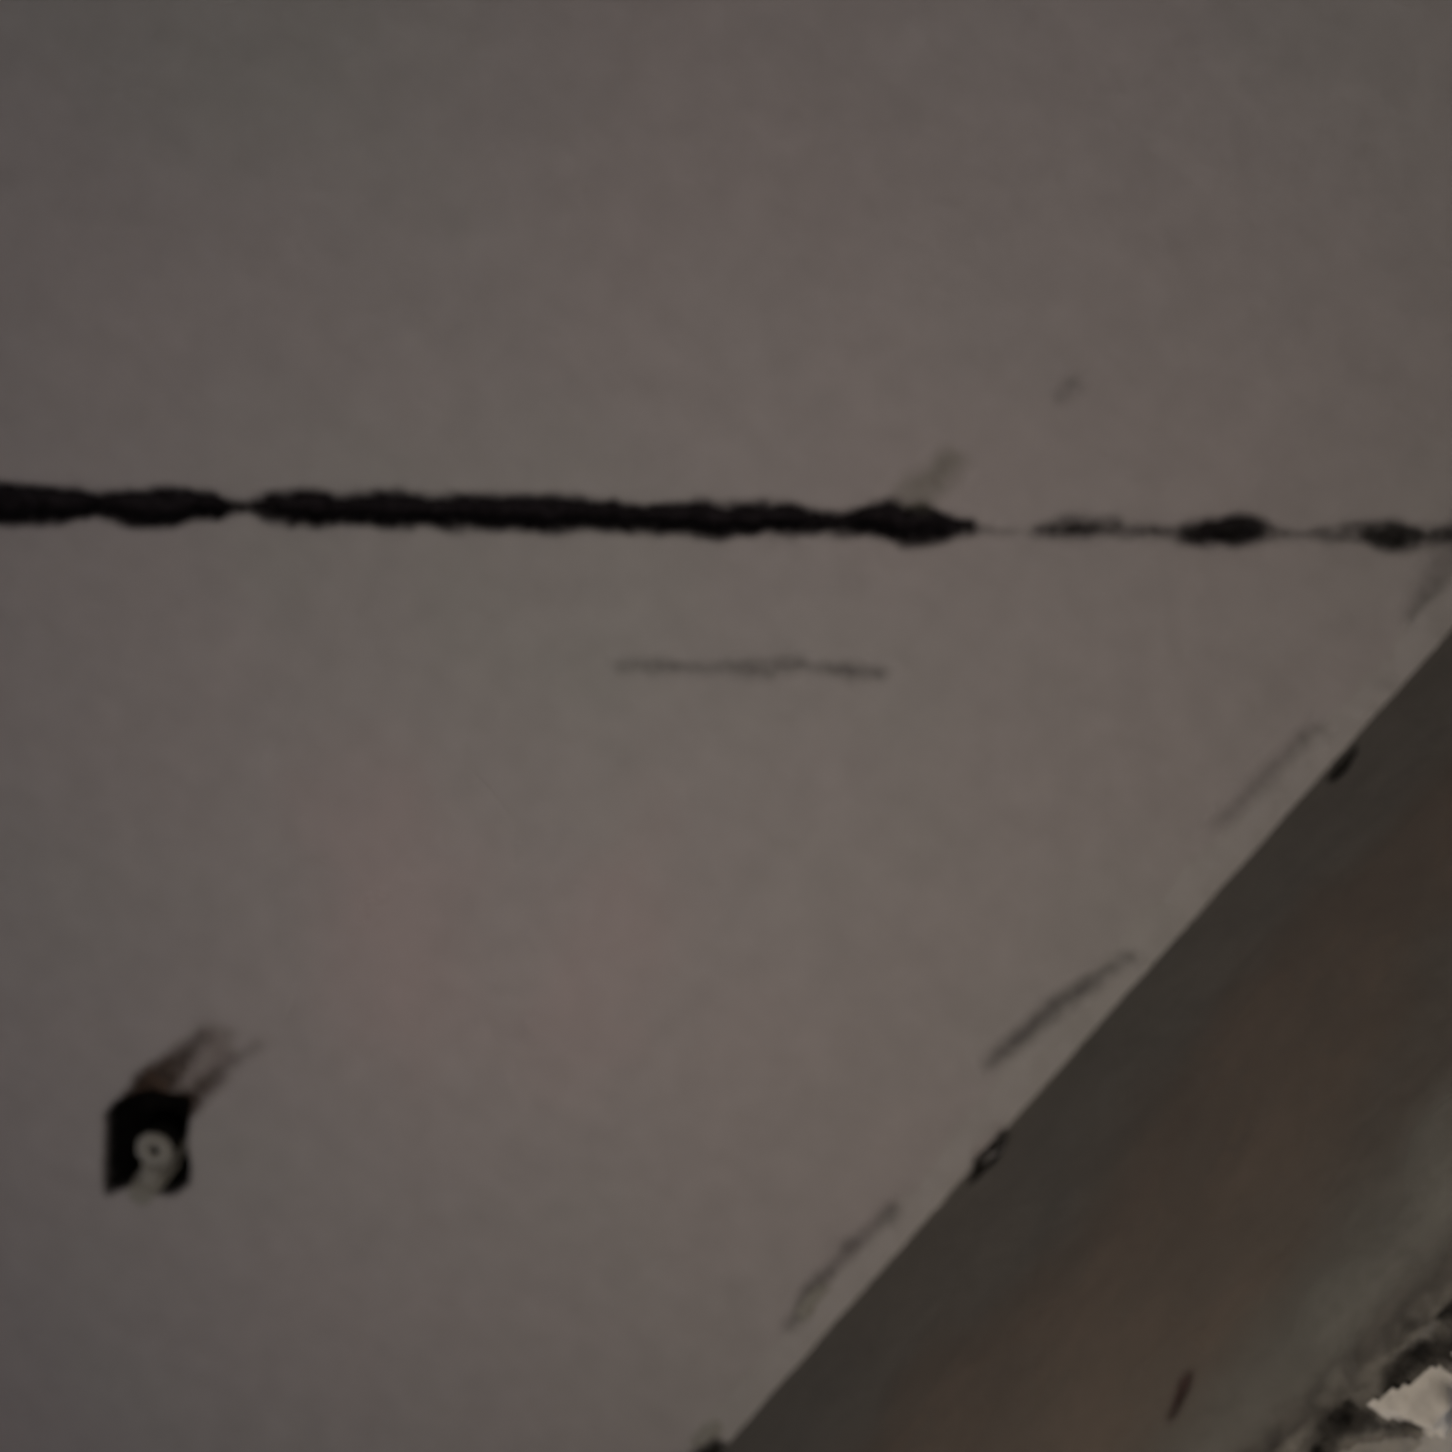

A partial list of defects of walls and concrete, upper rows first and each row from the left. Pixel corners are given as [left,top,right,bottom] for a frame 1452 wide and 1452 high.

crack [0,482,975,546]
crack [1039,522,1119,534]
crack [1182,515,1284,545]
crack [1325,523,1452,550]
spalling [1268,1290,1452,1452]